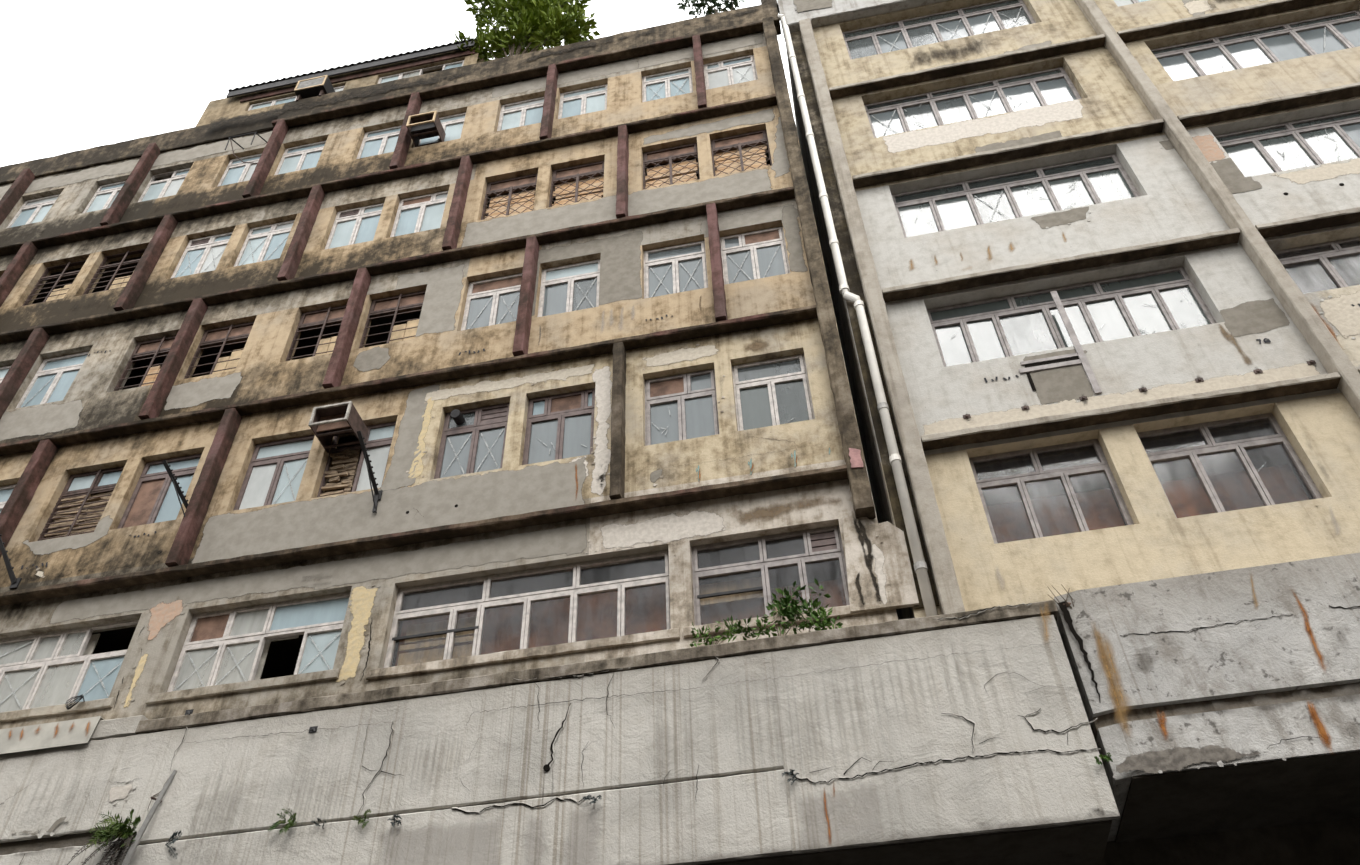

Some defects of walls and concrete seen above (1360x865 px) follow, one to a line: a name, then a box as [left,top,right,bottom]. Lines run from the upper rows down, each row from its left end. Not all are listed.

peeling [1319,290,1360,339]
peeling [122,596,187,707]
crack [109,721,403,816]
peeling [335,584,380,685]
crack [452,601,1101,814]
corrosion [1095,631,1125,724]
crack [1120,613,1293,637]
corrosion [1296,597,1323,665]
corrosion [1308,703,1330,745]
crack [1329,603,1360,611]